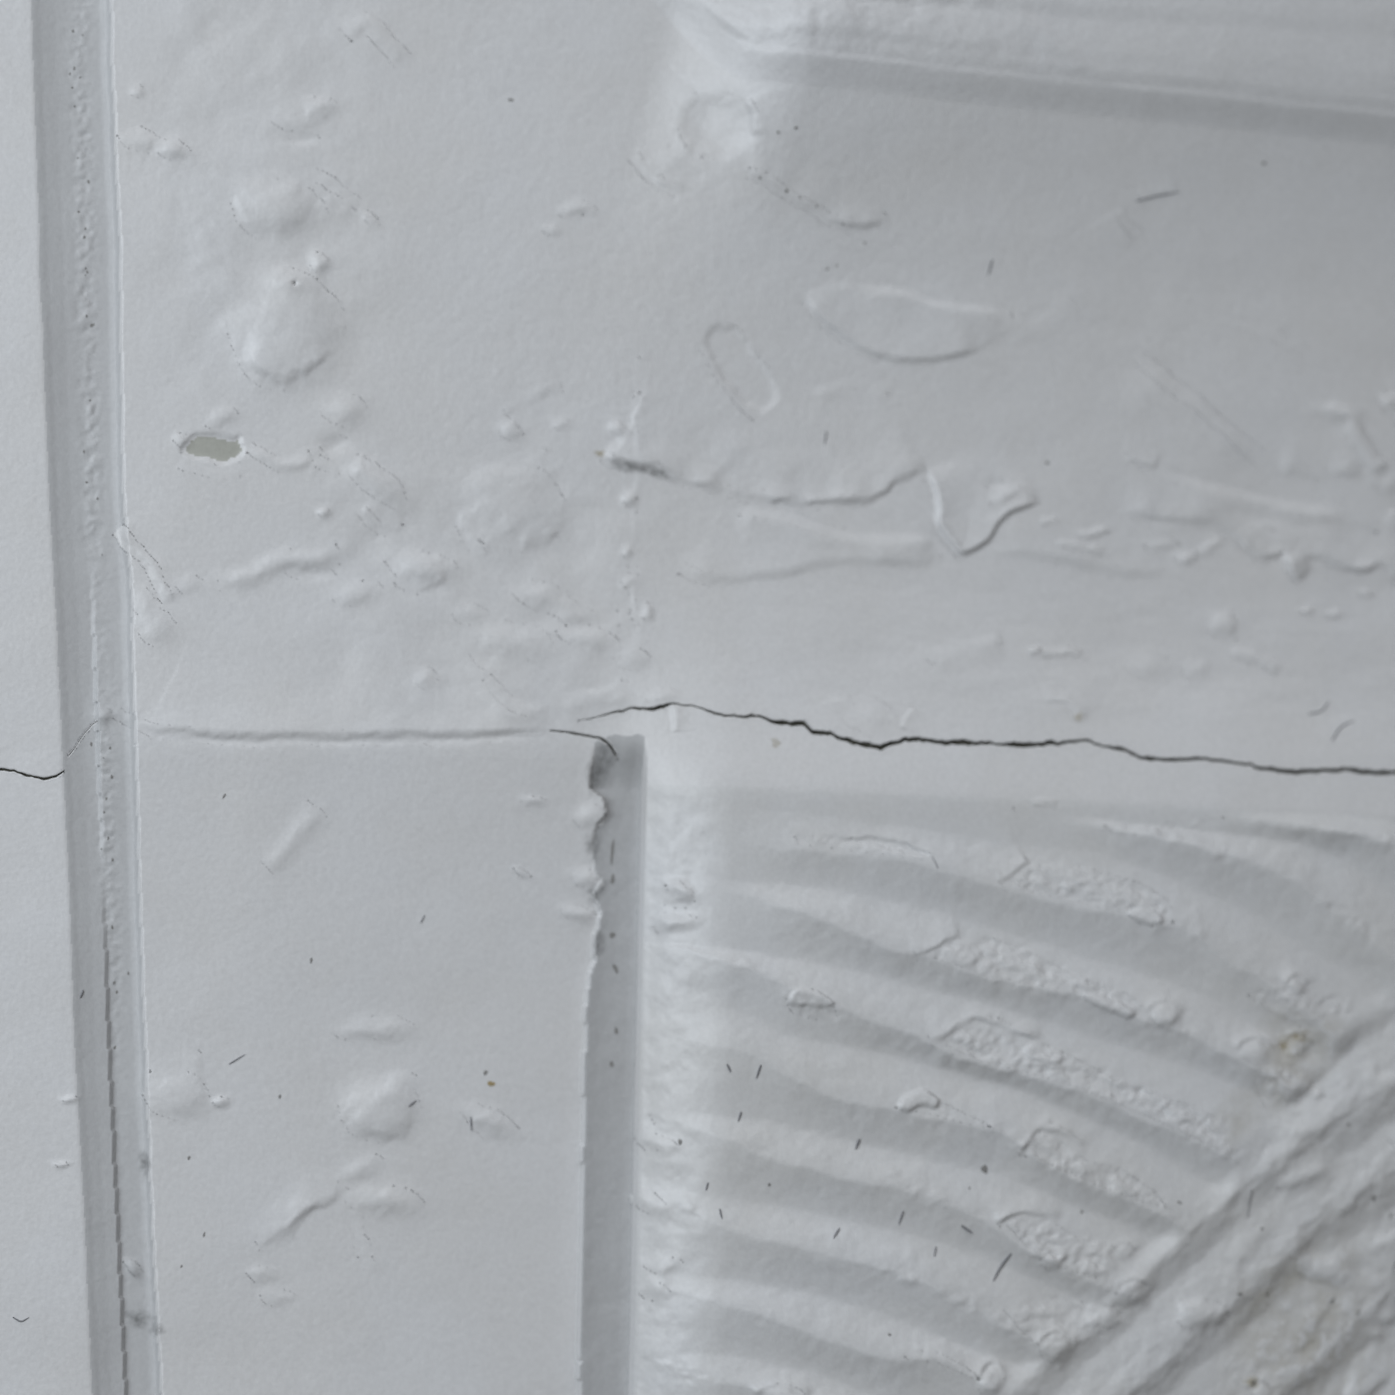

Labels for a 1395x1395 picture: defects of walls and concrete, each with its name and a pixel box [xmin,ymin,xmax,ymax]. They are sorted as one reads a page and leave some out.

peeling [173,407,244,479]
peeling [602,451,1039,588]
peeling [1122,507,1395,585]
crack [0,719,98,782]
crack [138,701,1395,777]